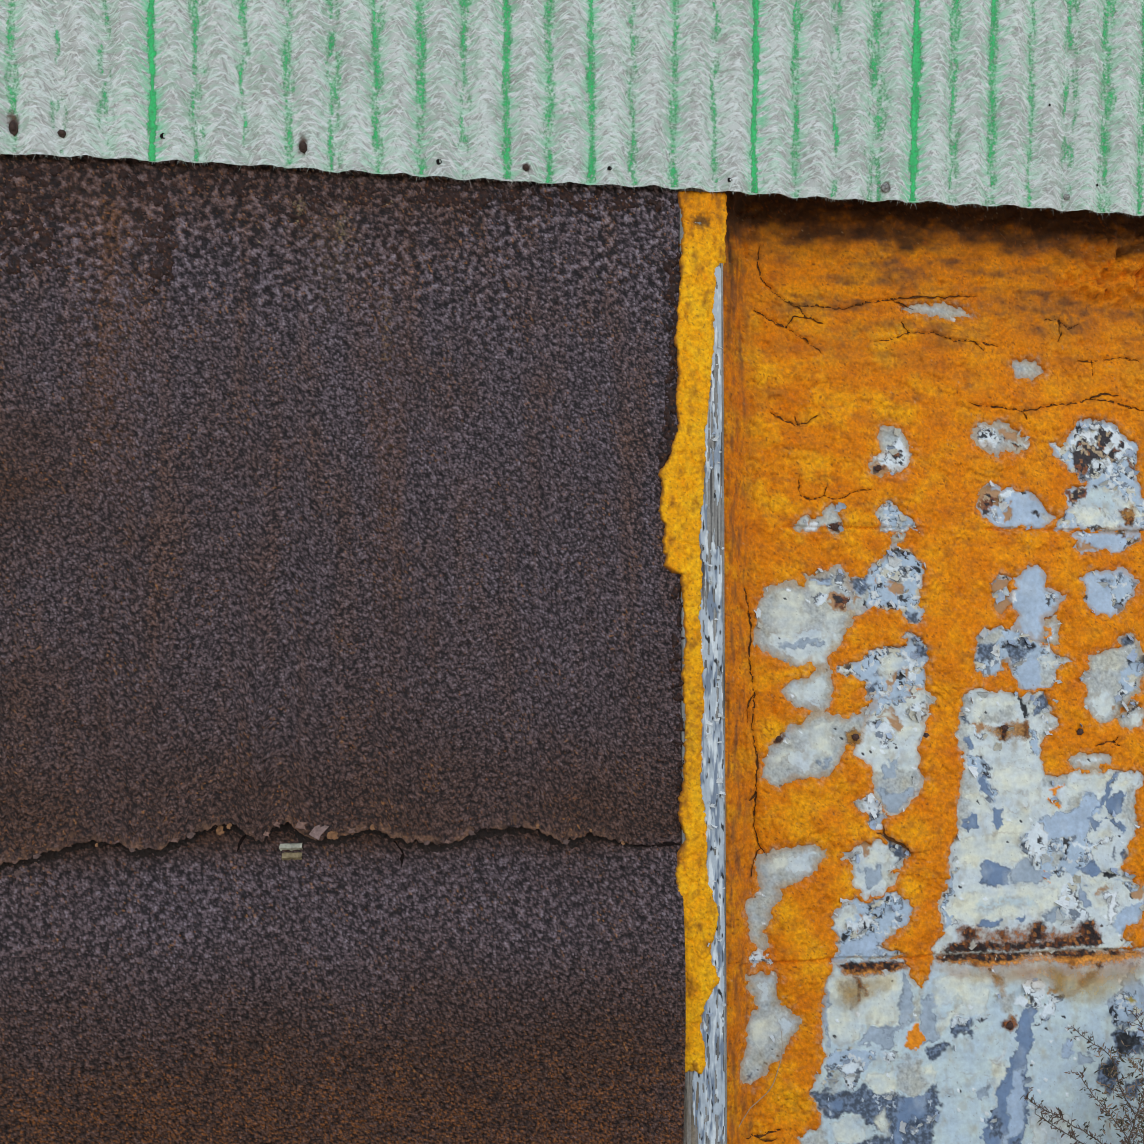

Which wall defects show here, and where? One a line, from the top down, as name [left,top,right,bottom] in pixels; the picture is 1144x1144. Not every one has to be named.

crack [754,247,995,353]
crack [1045,319,1078,341]
crack [972,357,1143,419]
crack [771,413,818,426]
peeling [868,425,913,478]
peeling [970,418,1144,555]
peeling [692,266,726,1144]
crack [0,820,681,876]
peeling [740,500,1144,1144]
corrosion [840,960,908,1001]
corrosion [936,920,1143,983]